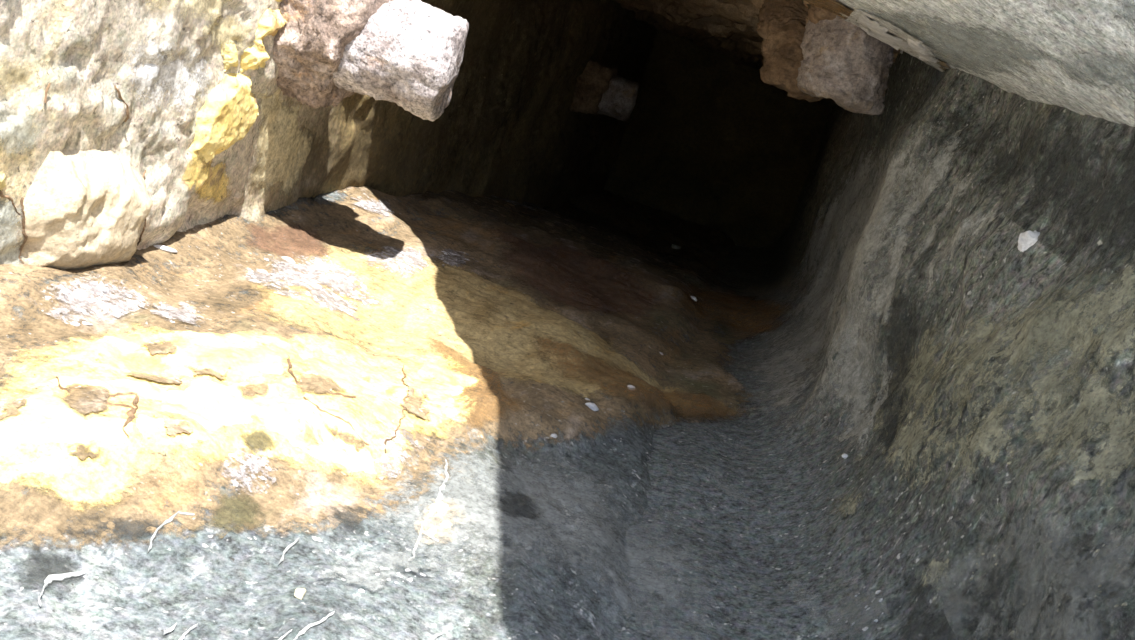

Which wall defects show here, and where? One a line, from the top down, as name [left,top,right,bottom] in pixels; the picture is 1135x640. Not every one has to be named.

damp [42,274,201,327]
damp [246,246,478,320]